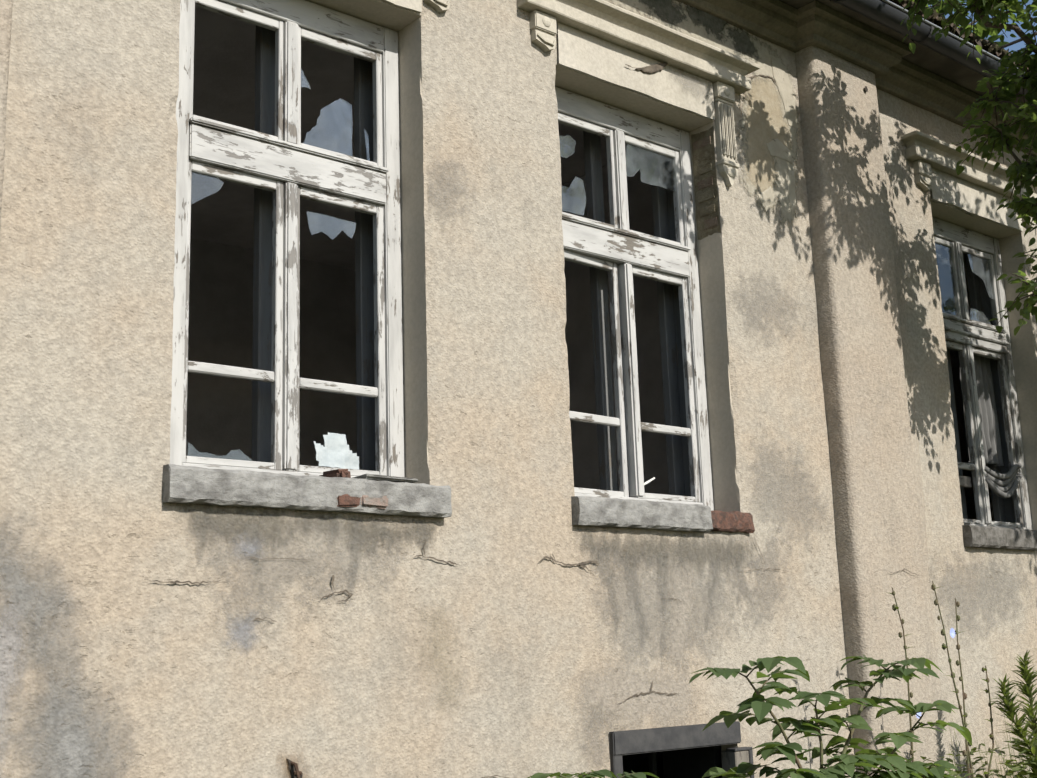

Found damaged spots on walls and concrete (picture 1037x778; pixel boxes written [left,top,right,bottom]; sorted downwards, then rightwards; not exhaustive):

flaking render [606,0,800,223]
water stain [187,504,433,554]
crack [412,541,459,565]
crack [539,554,599,571]
crack [318,575,353,602]
water stain [584,534,744,661]
crack [619,682,677,704]
corrosion [286,759,303,778]